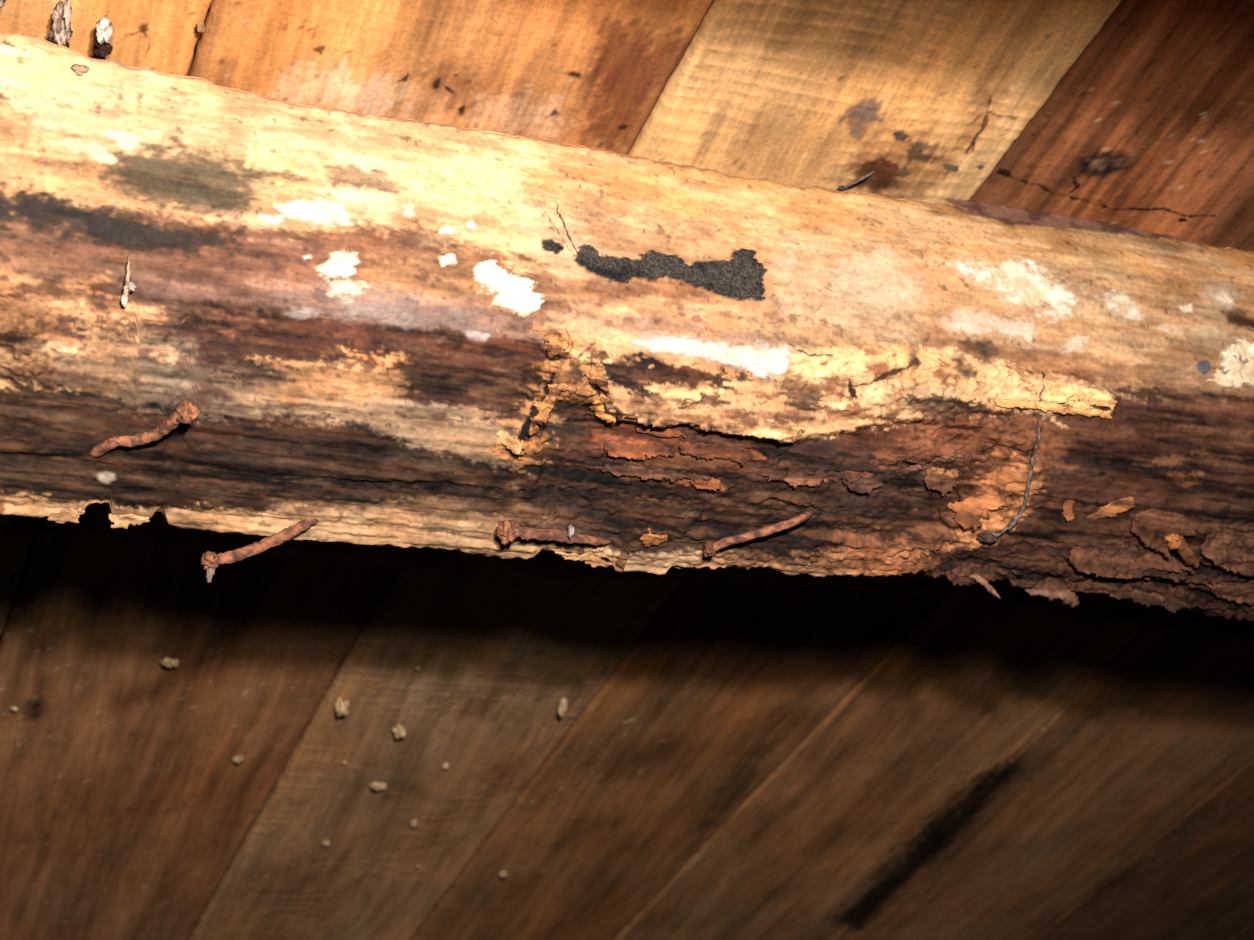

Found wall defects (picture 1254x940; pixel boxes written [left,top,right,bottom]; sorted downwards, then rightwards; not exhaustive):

damp [0,112,280,253]
crack [997,168,1216,221]
damp [948,259,1141,324]
damp [1213,290,1254,328]
peeling [589,397,806,444]
rust [206,568,215,584]
peeling [945,496,1254,613]